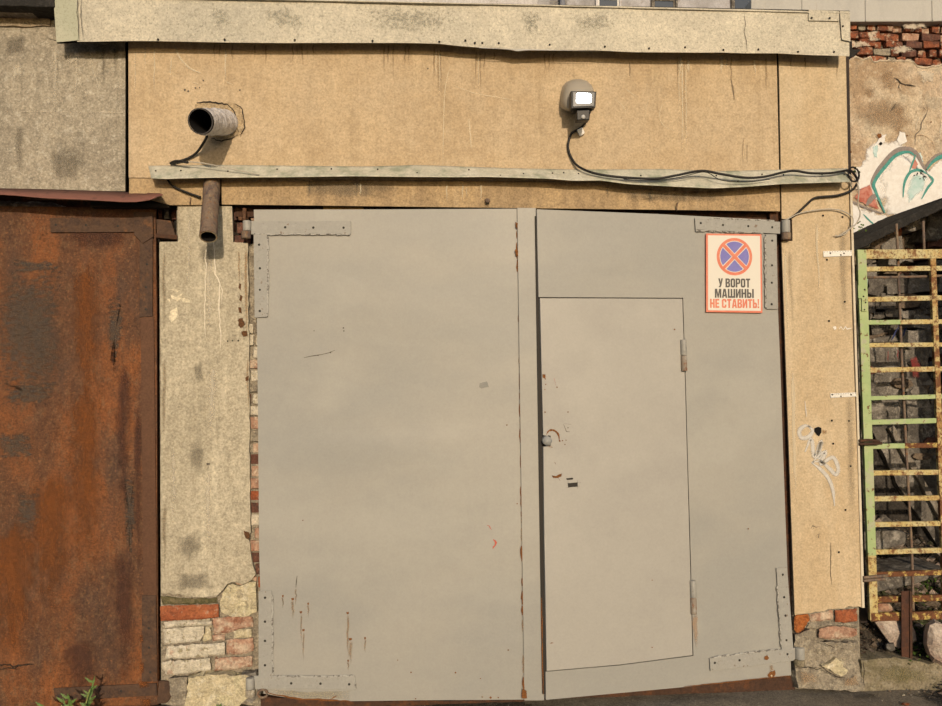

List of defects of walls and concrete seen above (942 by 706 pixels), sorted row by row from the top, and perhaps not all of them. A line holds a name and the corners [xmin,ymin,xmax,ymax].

flaking render [849,24,942,69]
rust [120,374,141,480]
spalling [160,580,263,706]
spalling [794,608,858,639]
spalling [820,657,848,676]